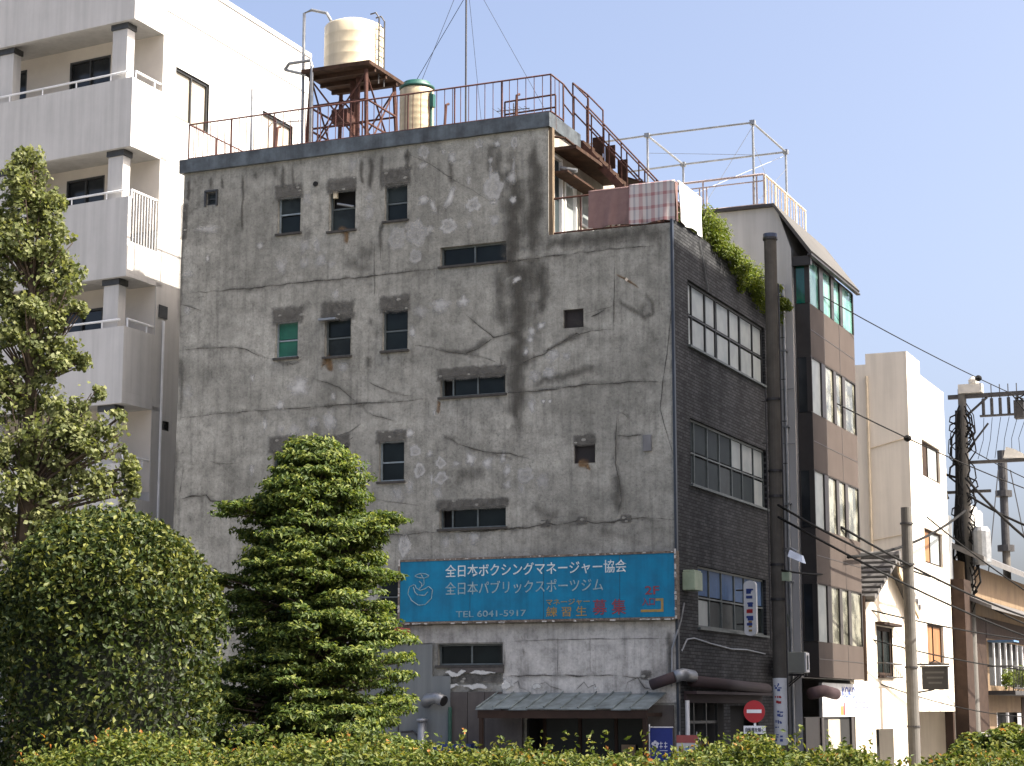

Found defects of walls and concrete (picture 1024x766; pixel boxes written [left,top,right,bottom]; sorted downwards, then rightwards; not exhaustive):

crack [184,243,419,310]
damp [504,151,546,420]
crack [418,246,648,367]
crack [182,361,423,439]
crack [509,318,673,452]
crack [180,469,230,502]
crack [448,411,670,532]